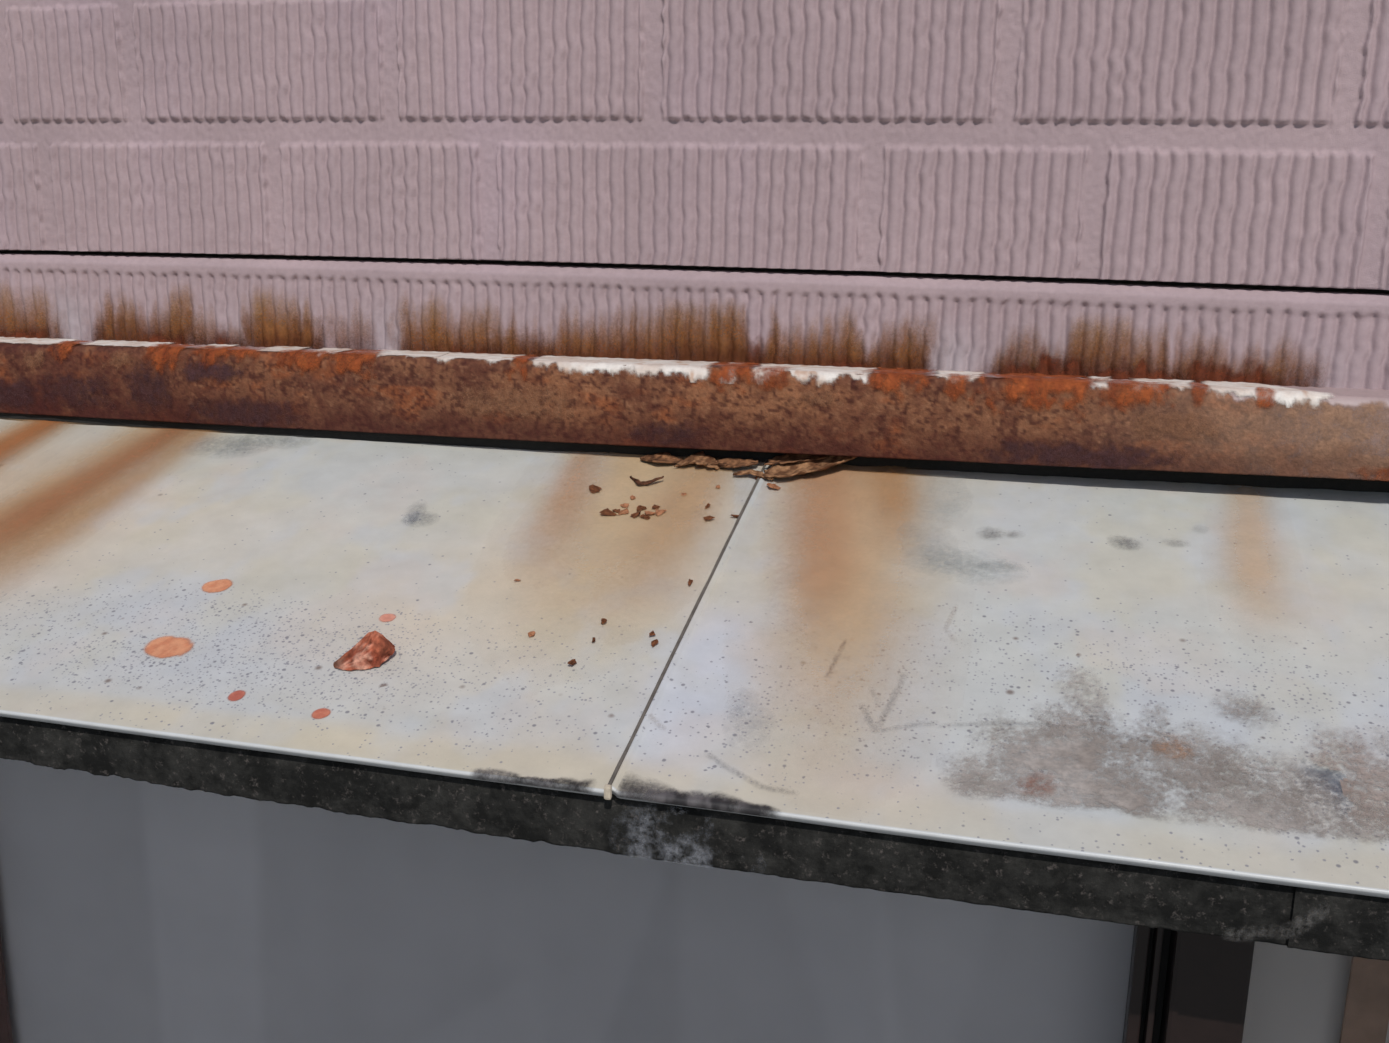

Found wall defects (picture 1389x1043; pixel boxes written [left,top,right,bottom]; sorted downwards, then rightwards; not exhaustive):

corrosion [0,294,1389,675]
corrosion [228,690,245,701]
corrosion [312,708,330,719]